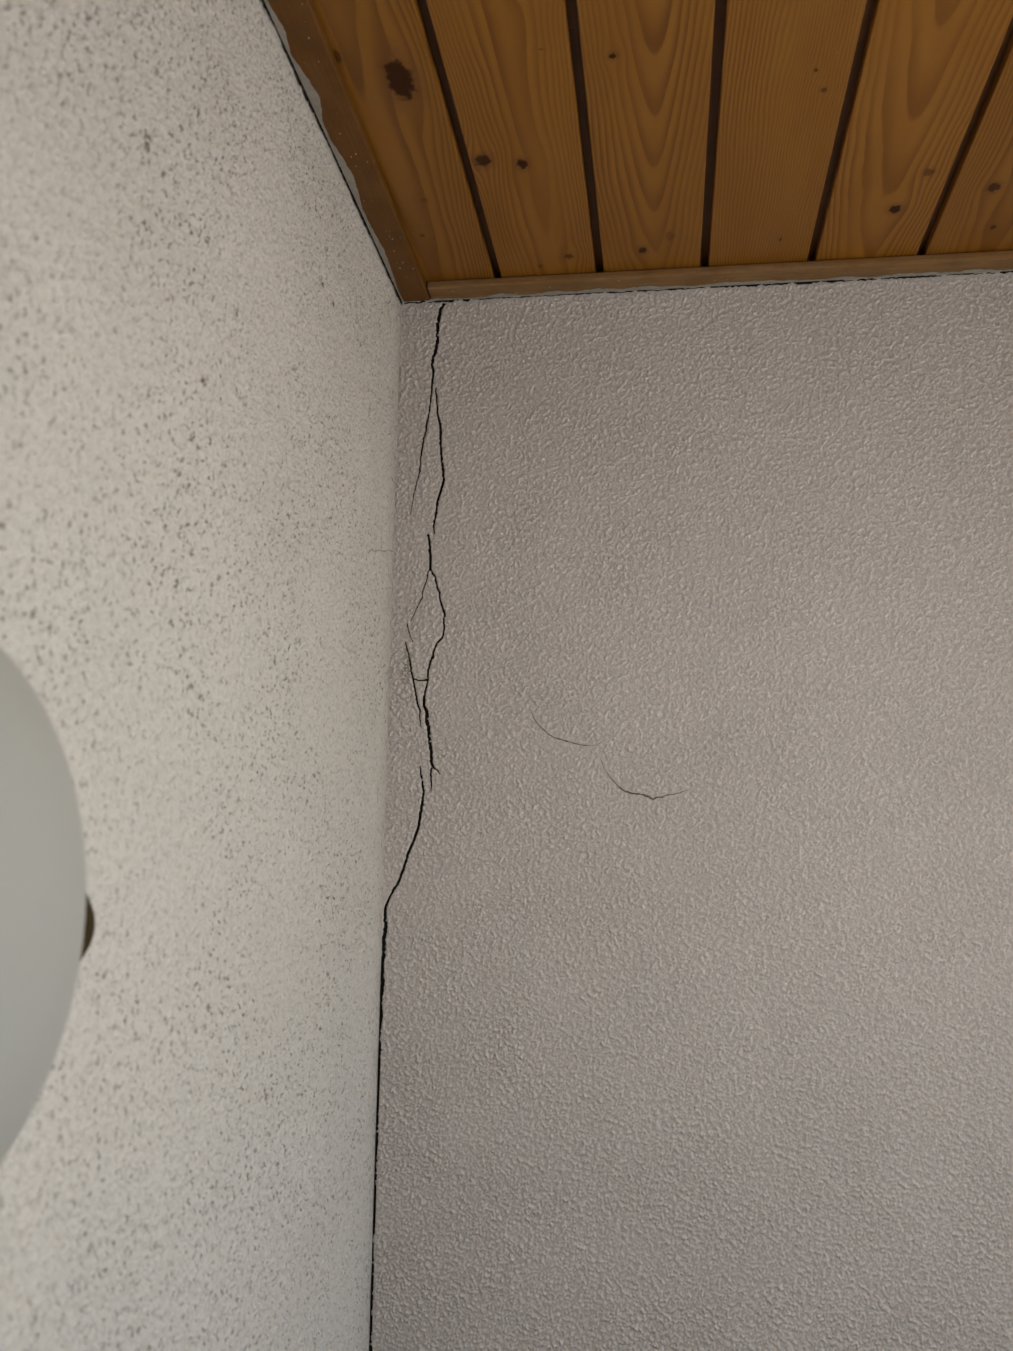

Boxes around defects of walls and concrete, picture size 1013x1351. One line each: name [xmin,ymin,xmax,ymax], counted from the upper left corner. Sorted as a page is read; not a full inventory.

crack [261,0,1013,1351]